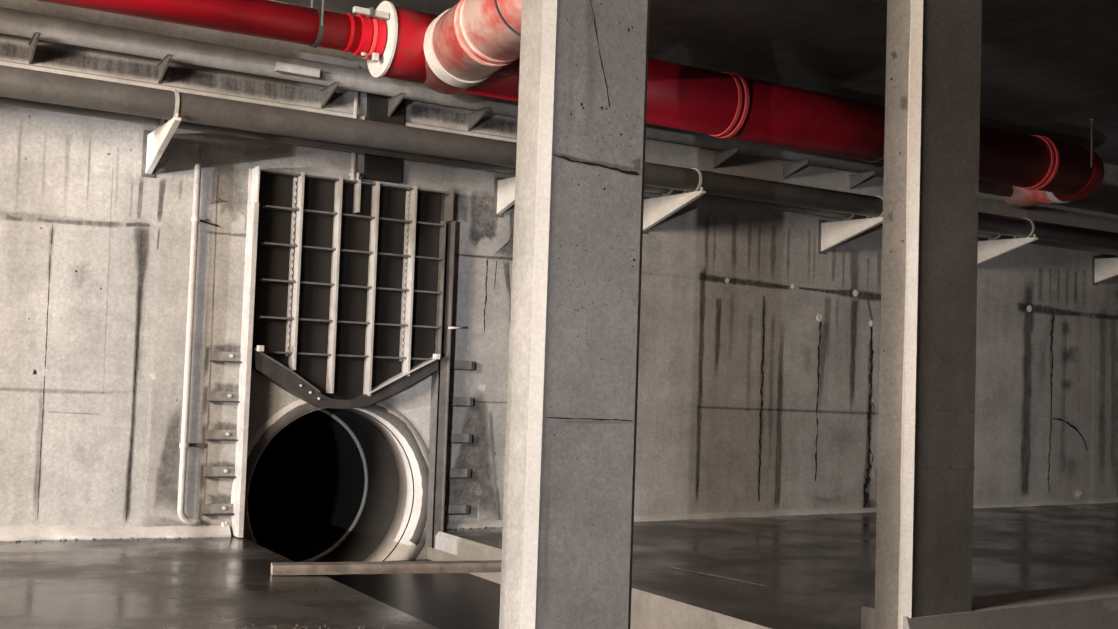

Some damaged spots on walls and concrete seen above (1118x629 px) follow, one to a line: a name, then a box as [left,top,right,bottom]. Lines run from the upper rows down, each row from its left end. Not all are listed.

crack [590,0,610,107]
leakage [455,194,514,260]
crack [553,154,640,175]
leakage [447,408,495,522]
leakage [696,271,881,496]
crack [863,326,875,508]
crack [1047,312,1088,493]
leakage [1019,290,1118,499]